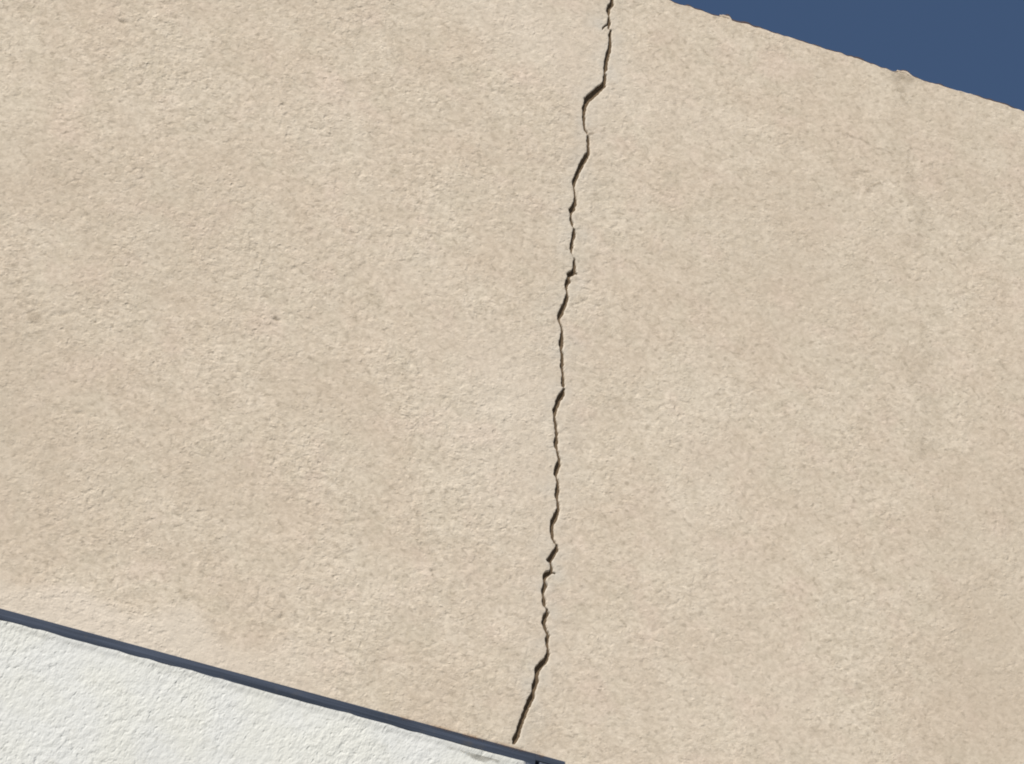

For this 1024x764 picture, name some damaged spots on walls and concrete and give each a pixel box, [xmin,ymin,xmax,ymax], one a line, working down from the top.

crack [512,0,614,745]